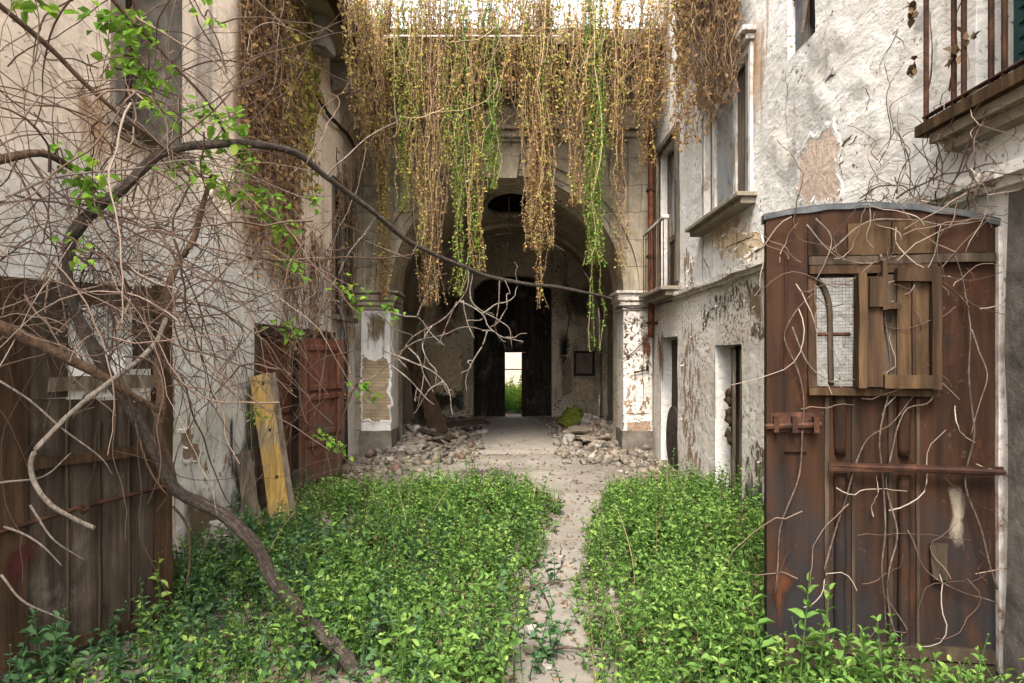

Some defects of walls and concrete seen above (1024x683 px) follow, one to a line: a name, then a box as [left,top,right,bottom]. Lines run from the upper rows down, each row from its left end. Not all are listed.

flaking render [795,116,844,207]
flaking render [359,353,393,425]
flaking render [623,317,653,431]
flaking render [681,224,764,472]
peeling [745,441,764,512]